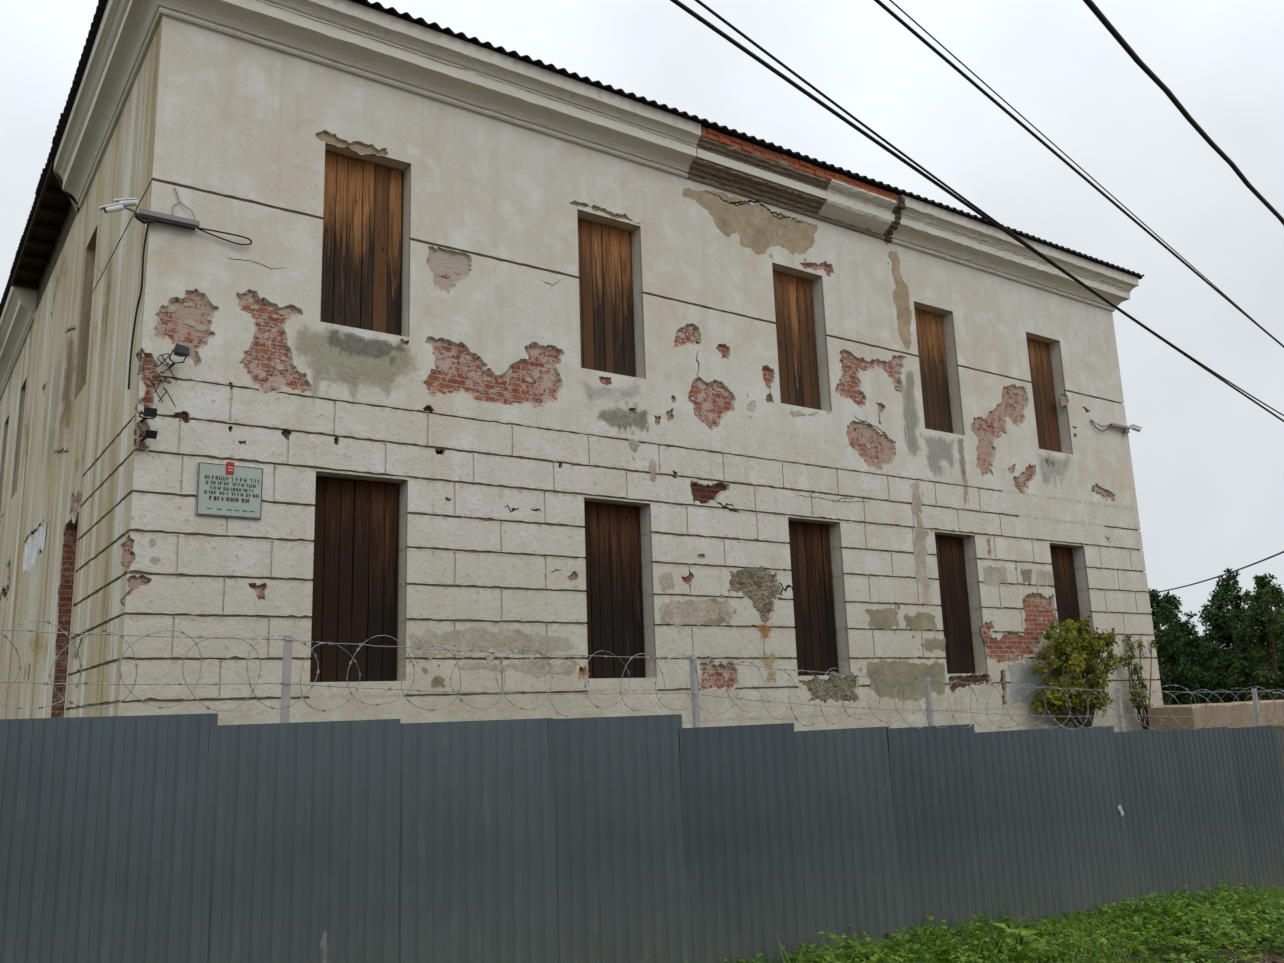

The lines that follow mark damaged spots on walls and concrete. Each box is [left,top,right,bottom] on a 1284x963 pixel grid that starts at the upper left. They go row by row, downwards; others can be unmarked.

flaking render [426,246,472,293]
peeling [682,187,835,277]
flaking render [133,288,219,454]
flaking render [236,289,312,394]
water stain [296,328,409,395]
flaking render [423,337,564,413]
flaking render [629,431,730,505]
flaking render [653,365,775,431]
flaking render [835,242,912,470]
flaking render [971,384,1054,495]
flaking render [799,481,1059,707]